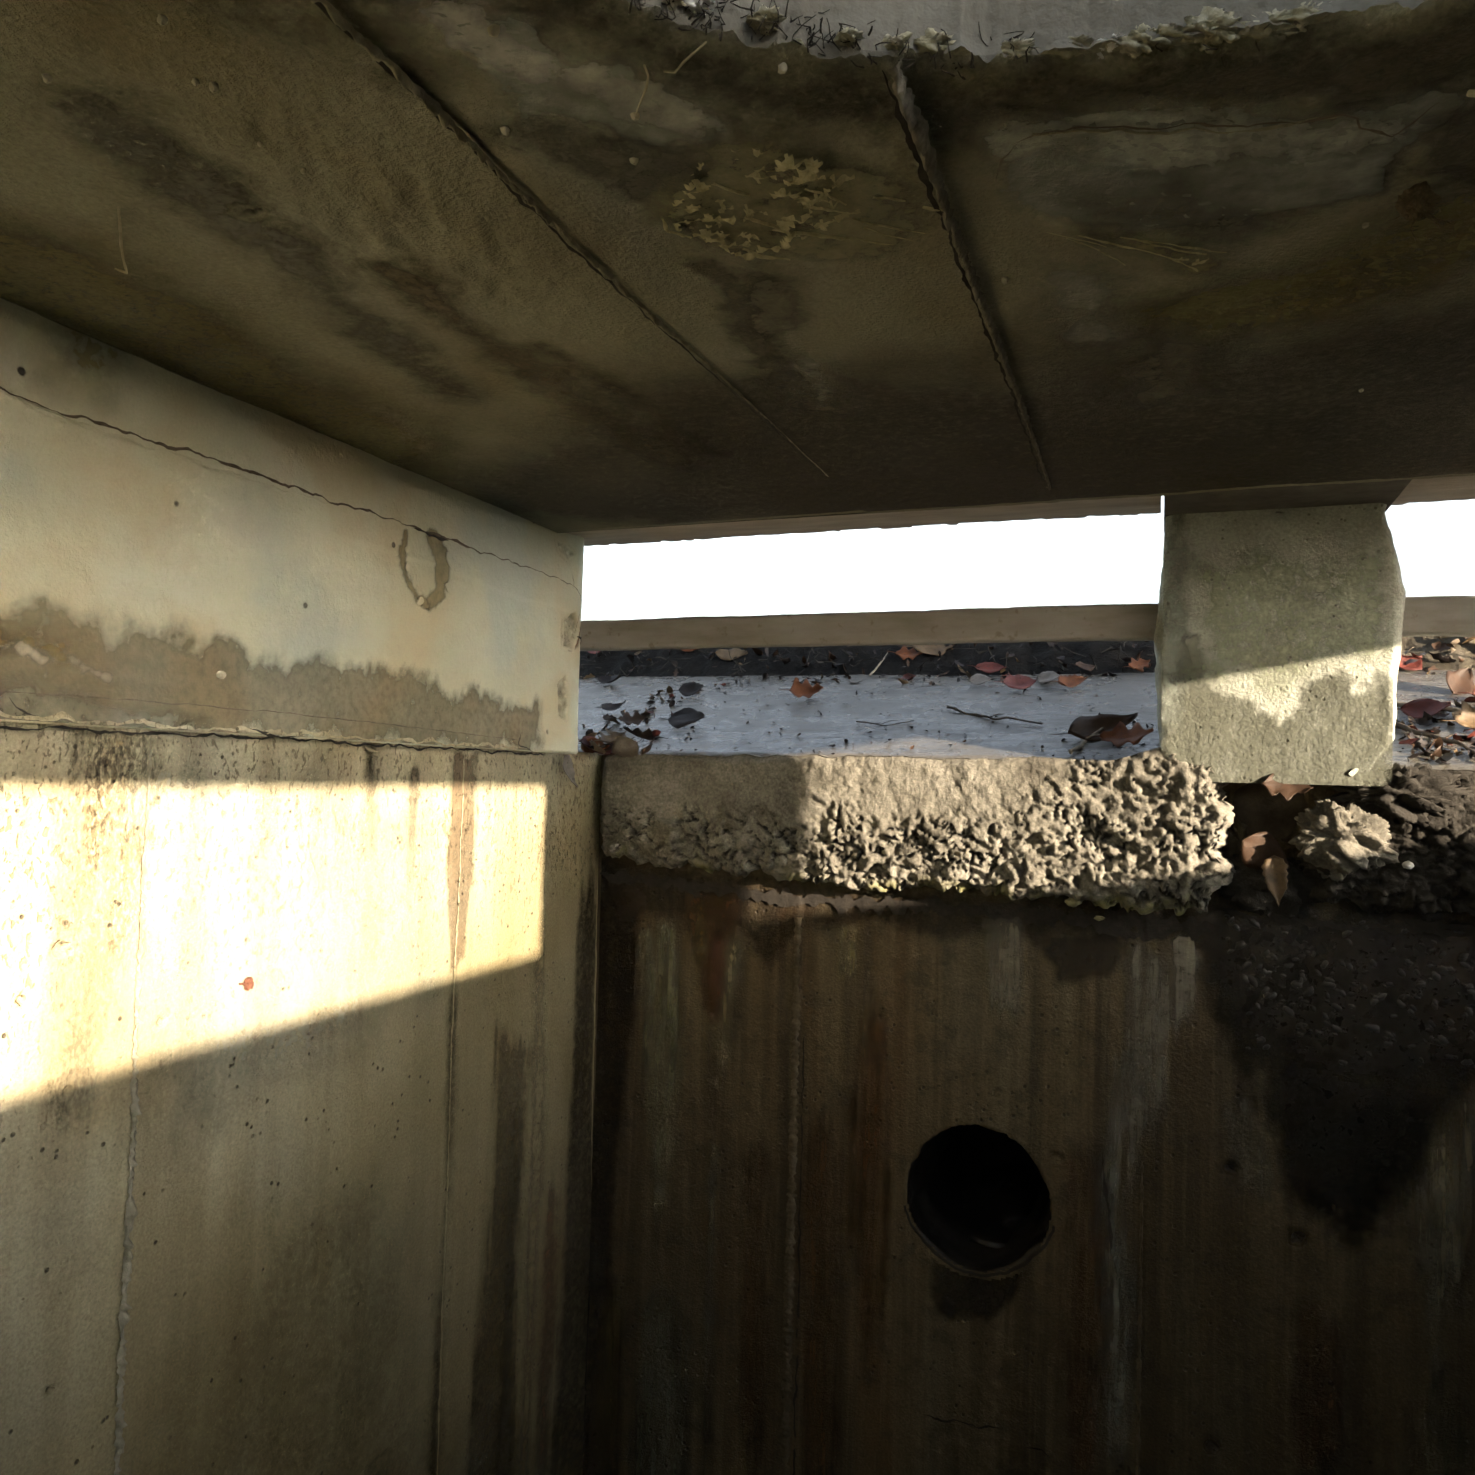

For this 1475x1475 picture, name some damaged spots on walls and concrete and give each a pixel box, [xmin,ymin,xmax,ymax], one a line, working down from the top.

damp [56,92,476,398]
crack [996,103,1438,179]
crack [0,386,583,644]
peeling [399,527,454,610]
damp [1162,514,1393,786]
damp [0,597,540,1095]
damp [447,995,457,1154]
damp [468,925,545,1475]
damp [606,864,1475,1456]